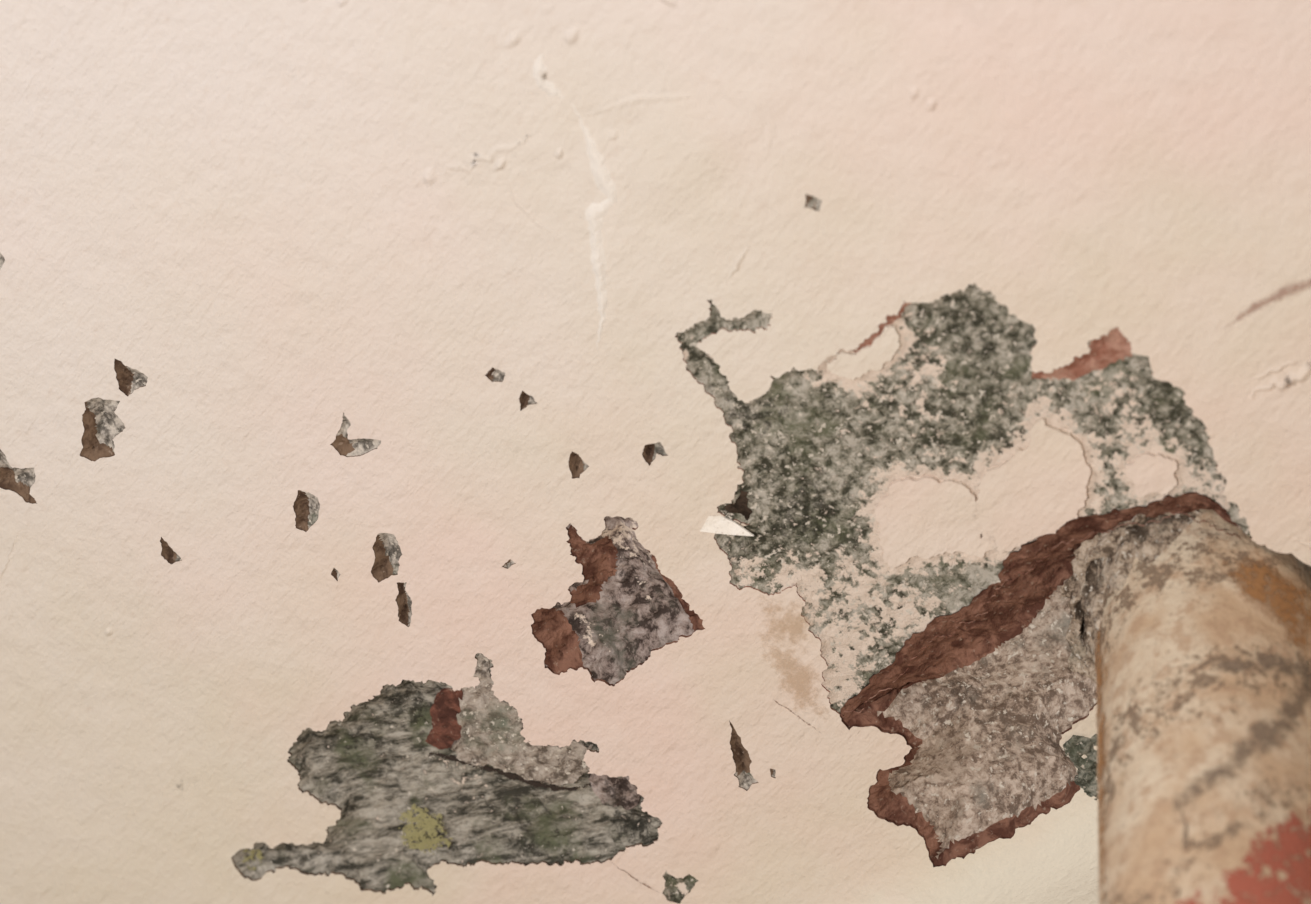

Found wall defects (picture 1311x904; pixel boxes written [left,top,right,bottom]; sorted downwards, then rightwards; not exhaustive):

spalling [80,359,148,462]
spalling [0,449,36,504]
spalling [293,490,320,532]
spalling [371,533,412,627]
spalling [531,516,705,686]
peeling [675,283,1252,867]
peeling [231,653,662,896]